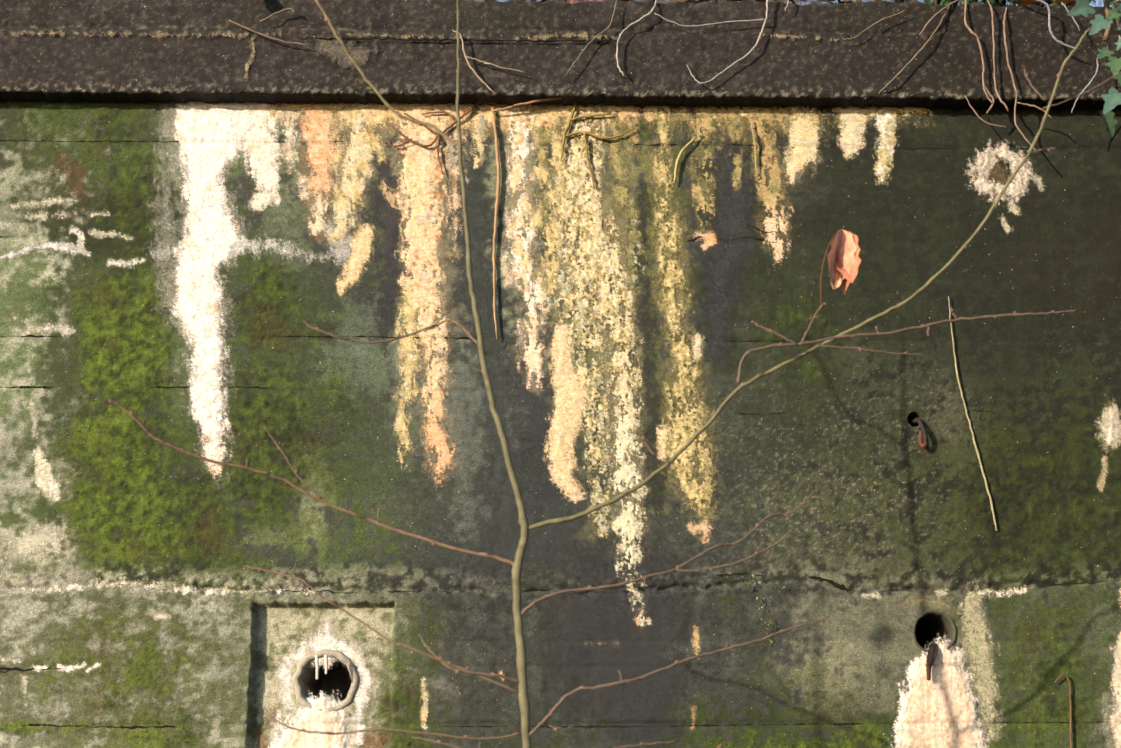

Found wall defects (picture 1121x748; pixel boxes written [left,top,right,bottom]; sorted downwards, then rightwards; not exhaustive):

water stain [965,139,1044,234]
water stain [151,101,932,748]
water stain [1094,399,1121,492]
water stain [891,585,1027,748]
water stain [1101,634,1121,748]